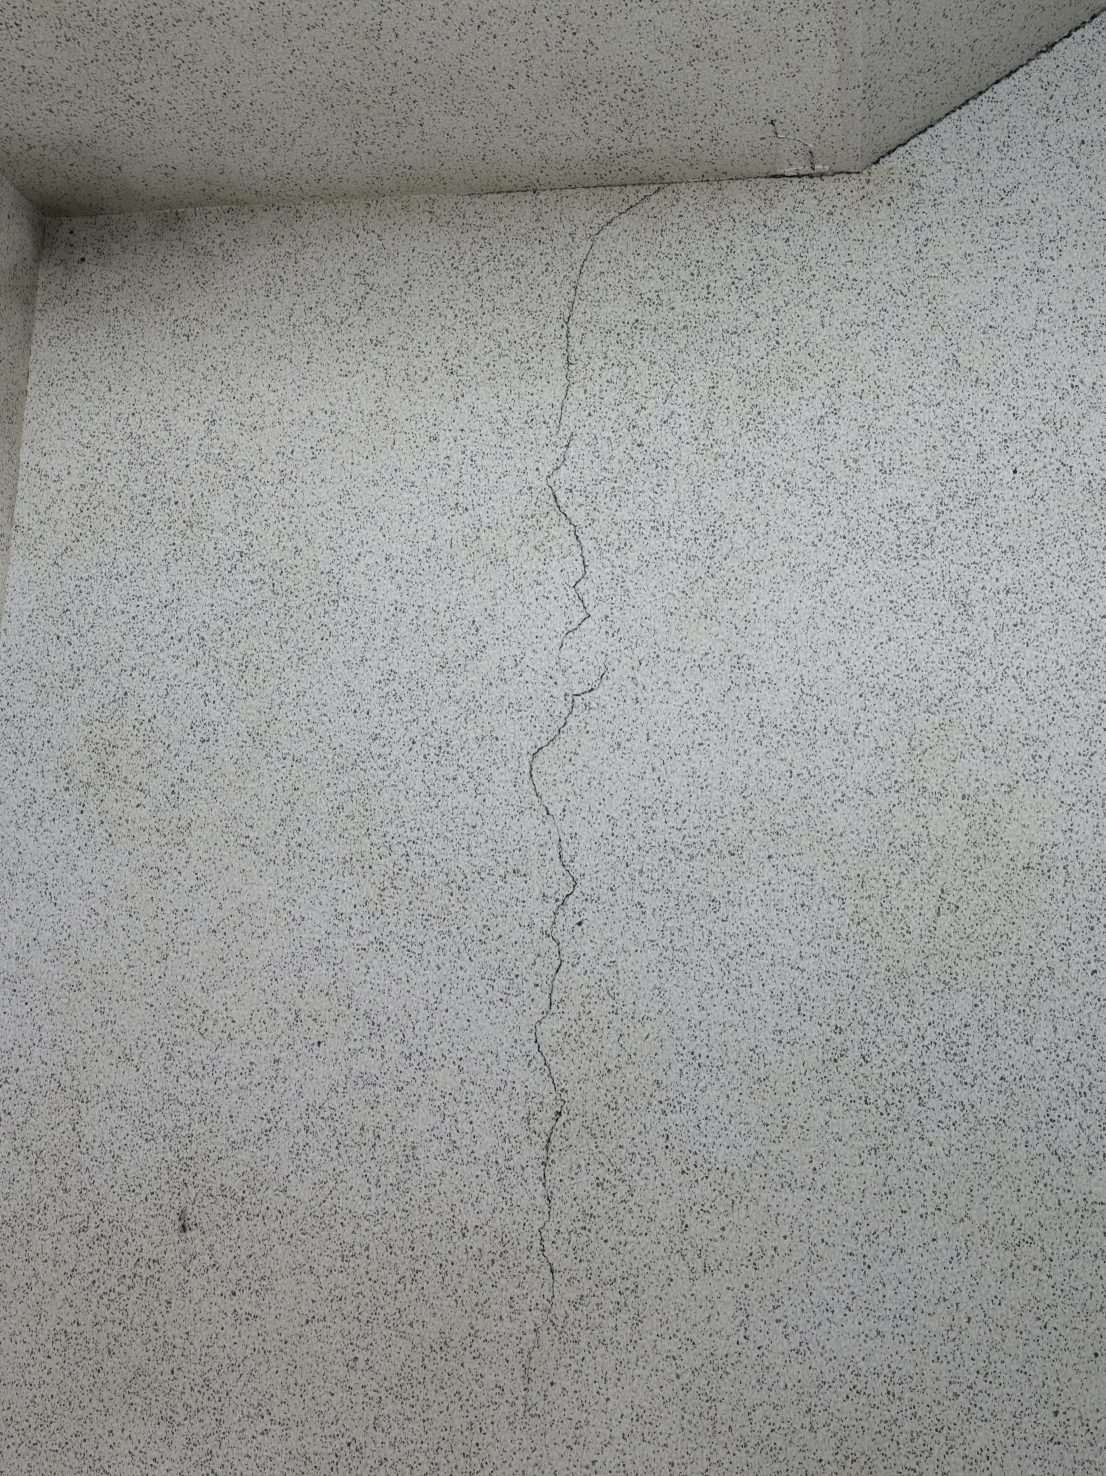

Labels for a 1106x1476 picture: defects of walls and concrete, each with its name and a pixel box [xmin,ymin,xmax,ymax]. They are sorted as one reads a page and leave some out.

crack [467,7,1106,1420]